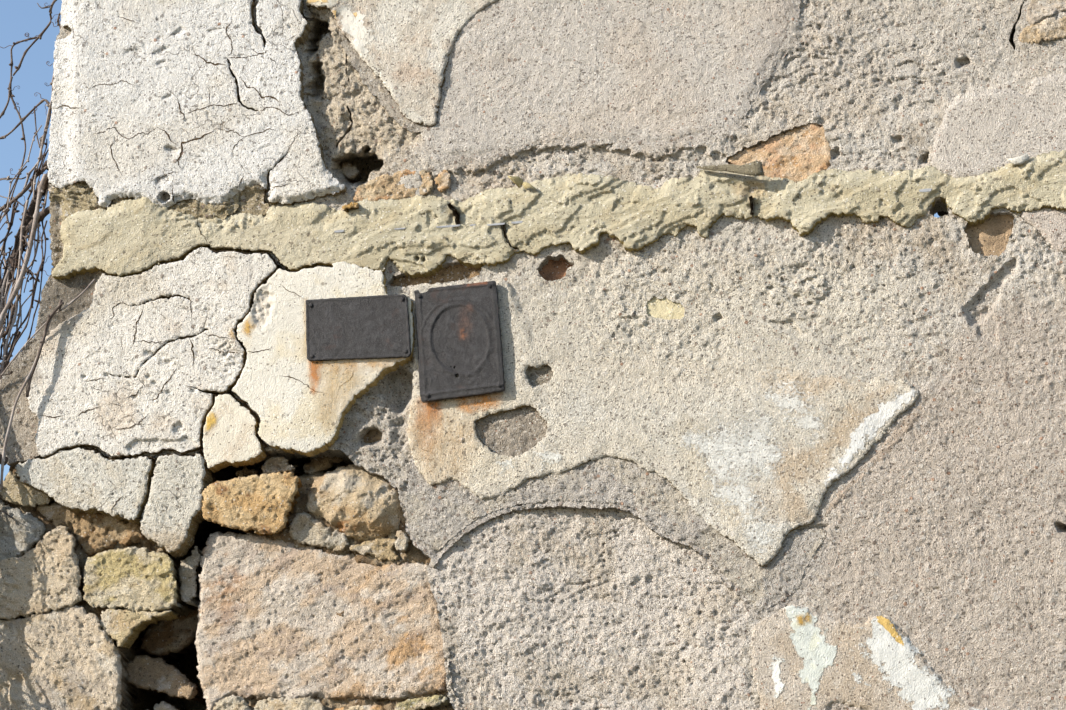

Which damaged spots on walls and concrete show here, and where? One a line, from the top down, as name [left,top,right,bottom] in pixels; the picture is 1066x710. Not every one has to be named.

crack [94,0,296,204]
peeling [507,175,538,191]
flaking render [306,0,802,162]
peeling [696,161,764,176]
crack [1009,10,1021,50]
crack [45,219,333,469]
spalling [404,381,923,710]